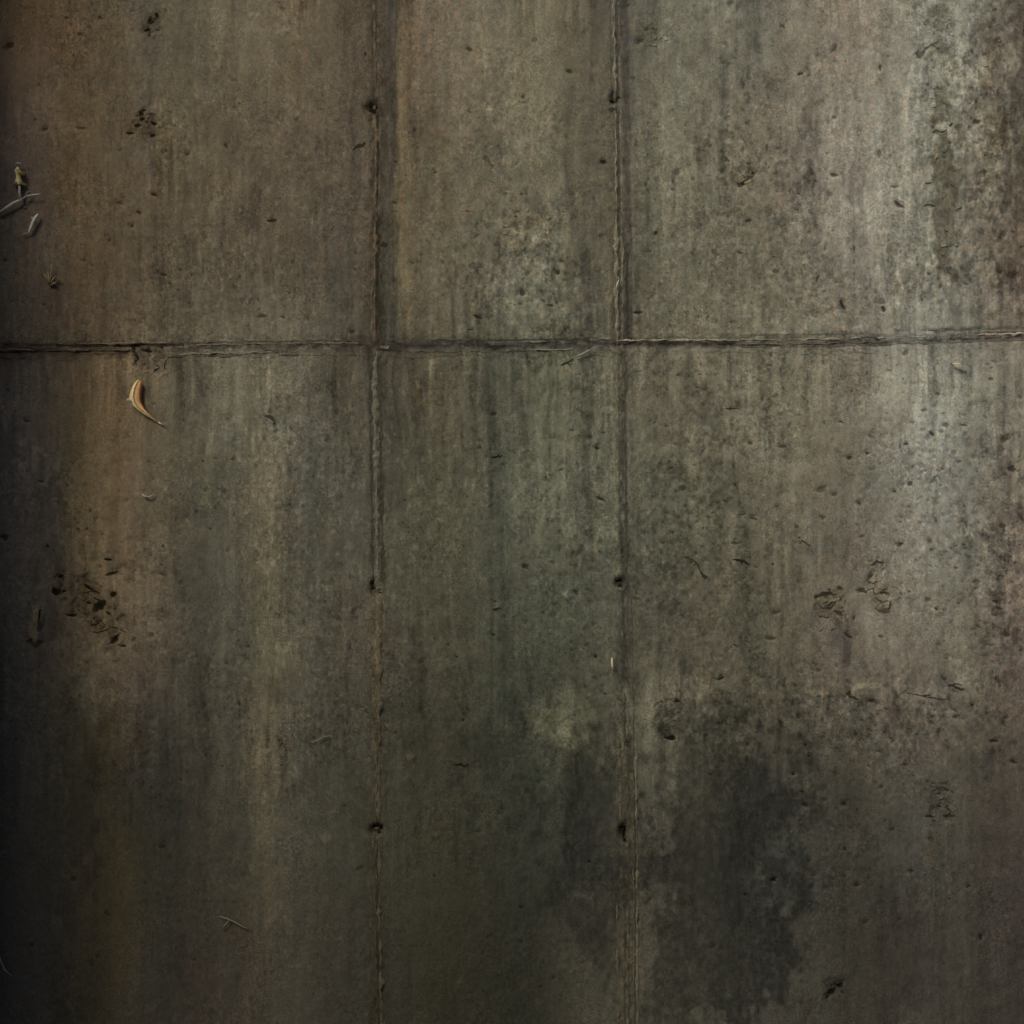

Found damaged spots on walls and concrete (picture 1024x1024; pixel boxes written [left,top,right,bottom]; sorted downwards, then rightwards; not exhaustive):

damp [856,0,974,332]
damp [634,348,1024,1024]